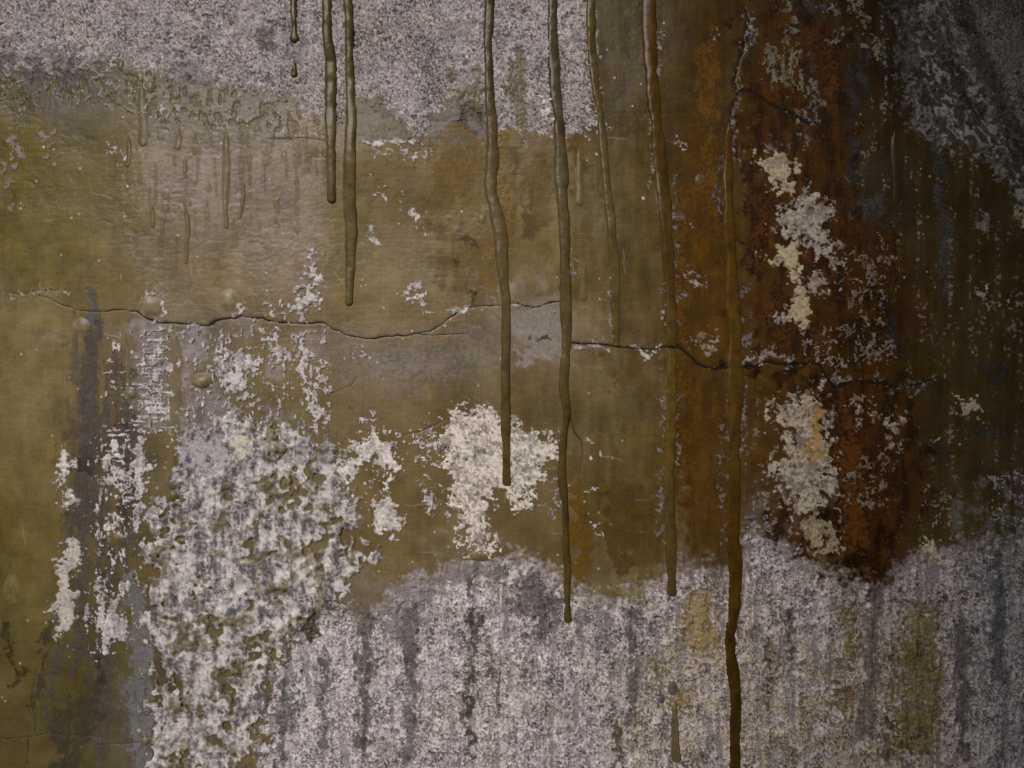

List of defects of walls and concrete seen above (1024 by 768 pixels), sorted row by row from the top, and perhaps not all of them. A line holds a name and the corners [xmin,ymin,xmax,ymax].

damp [290,0,299,43]
damp [221,130,246,229]
damp [183,205,191,264]
crack [1,285,560,339]
rust [724,0,938,581]
damp [322,0,908,768]
crack [571,325,944,397]
peeling [43,248,332,662]
peeling [326,397,561,559]
damp [297,610,321,643]
damp [316,657,331,749]